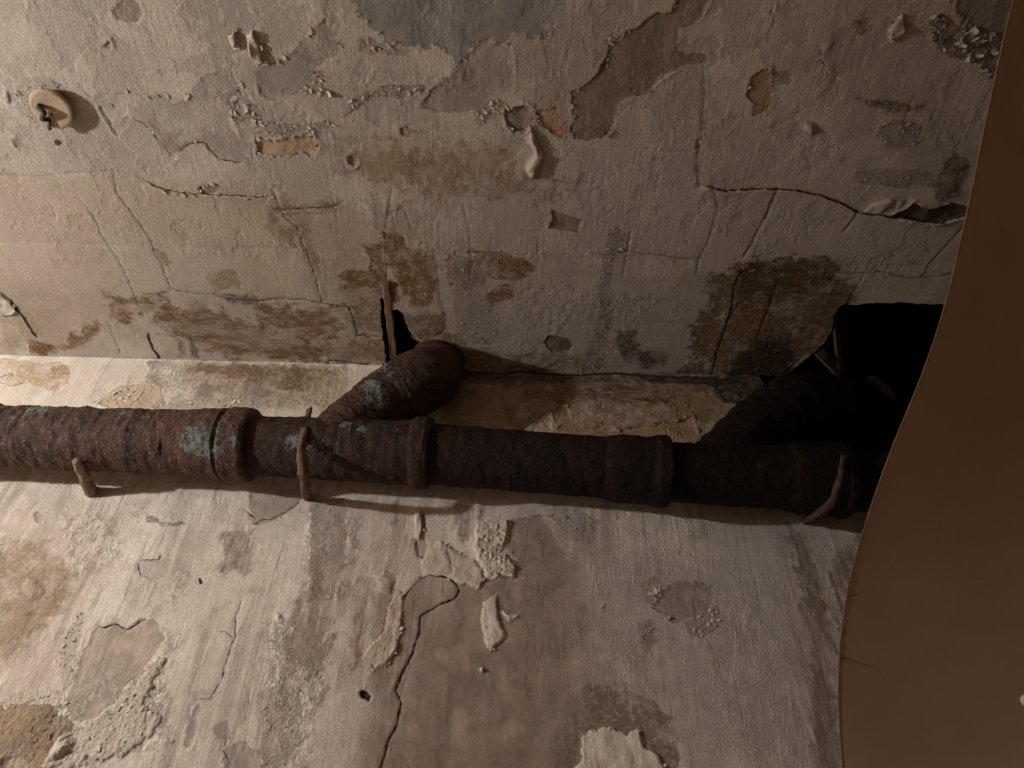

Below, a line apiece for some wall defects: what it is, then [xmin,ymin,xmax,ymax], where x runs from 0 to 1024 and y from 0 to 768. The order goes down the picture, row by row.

flaking render [224,90,336,158]
peeling [345,0,710,141]
flaking render [746,67,791,116]
peeling [929,0,1012,79]
crack [7,169,379,364]
crack [464,65,965,430]
water stain [638,253,856,386]
peeling [0,612,166,768]
crack [379,517,460,768]
peeling [360,509,562,768]
peeling [575,726,666,768]